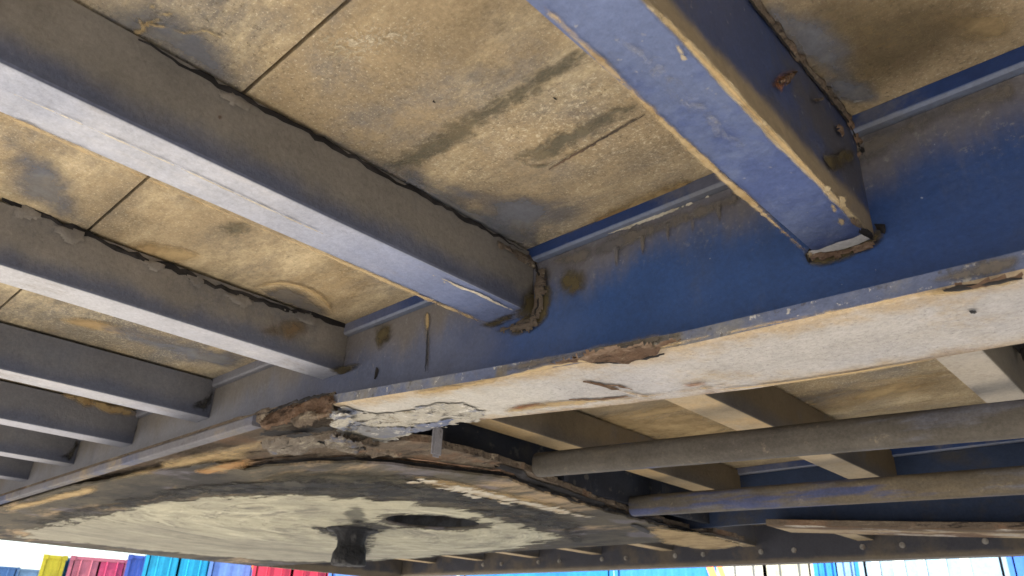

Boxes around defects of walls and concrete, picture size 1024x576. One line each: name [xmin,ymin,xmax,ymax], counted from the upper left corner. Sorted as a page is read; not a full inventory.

crack [549,114,645,170]
corrosion [549,14,797,243]
corrosion [183,195,583,334]
corrosion [805,224,886,265]
peeling [260,403,485,458]
leakage [9,488,94,510]